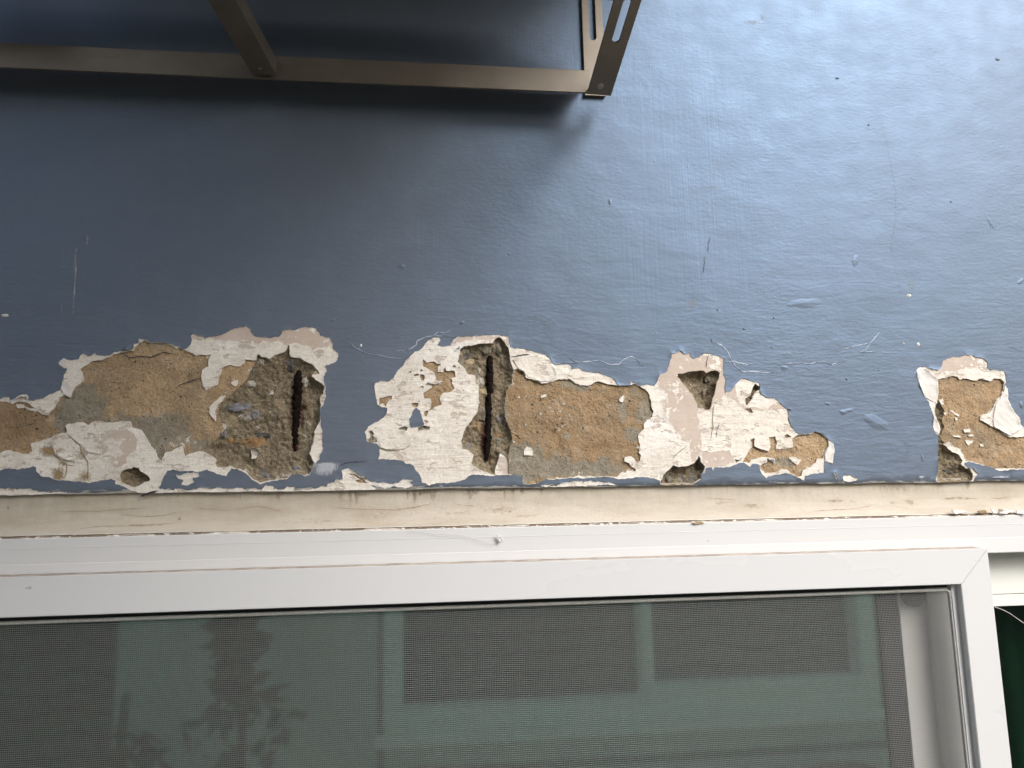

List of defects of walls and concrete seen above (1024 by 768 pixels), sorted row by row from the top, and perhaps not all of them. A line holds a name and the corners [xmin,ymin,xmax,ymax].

peeling [0,326,858,496]